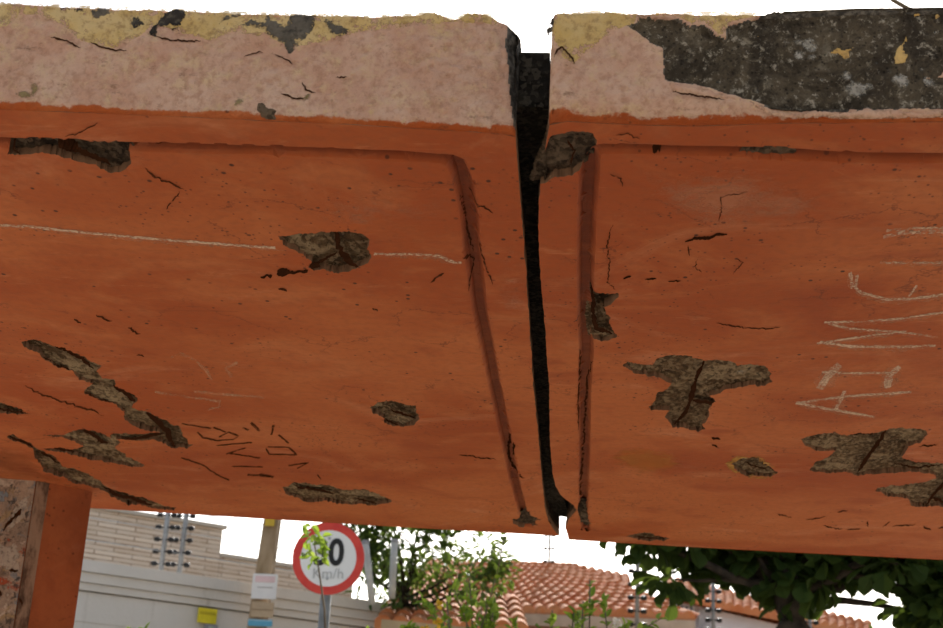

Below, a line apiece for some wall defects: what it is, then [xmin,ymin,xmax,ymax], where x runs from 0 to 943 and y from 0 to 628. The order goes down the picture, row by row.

peeling [0,2,500,48]
crack [554,46,575,64]
crack [674,91,725,100]
spalling [552,7,943,119]
spalling [6,137,135,167]
crack [460,188,493,289]
crack [606,192,745,289]
spalling [9,339,188,508]
crack [462,433,522,478]
crack [577,349,593,495]
spalling [627,355,770,428]
spalling [803,427,943,506]